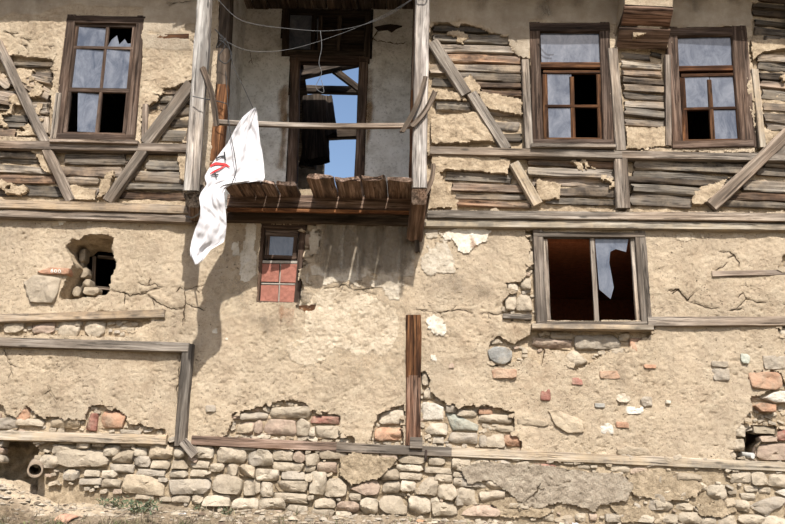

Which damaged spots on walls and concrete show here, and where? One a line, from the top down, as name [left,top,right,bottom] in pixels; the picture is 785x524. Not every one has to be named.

spalling [0,50,58,138]
spalling [427,22,531,212]
spalling [620,51,672,151]
spalling [749,0,785,145]
spalling [119,154,186,205]
spalling [527,159,615,207]
crack [116,277,204,325]
peeling [285,224,492,366]
crack [668,289,785,311]
spalling [222,401,349,443]
spalling [421,371,521,450]
spalling [724,396,785,461]